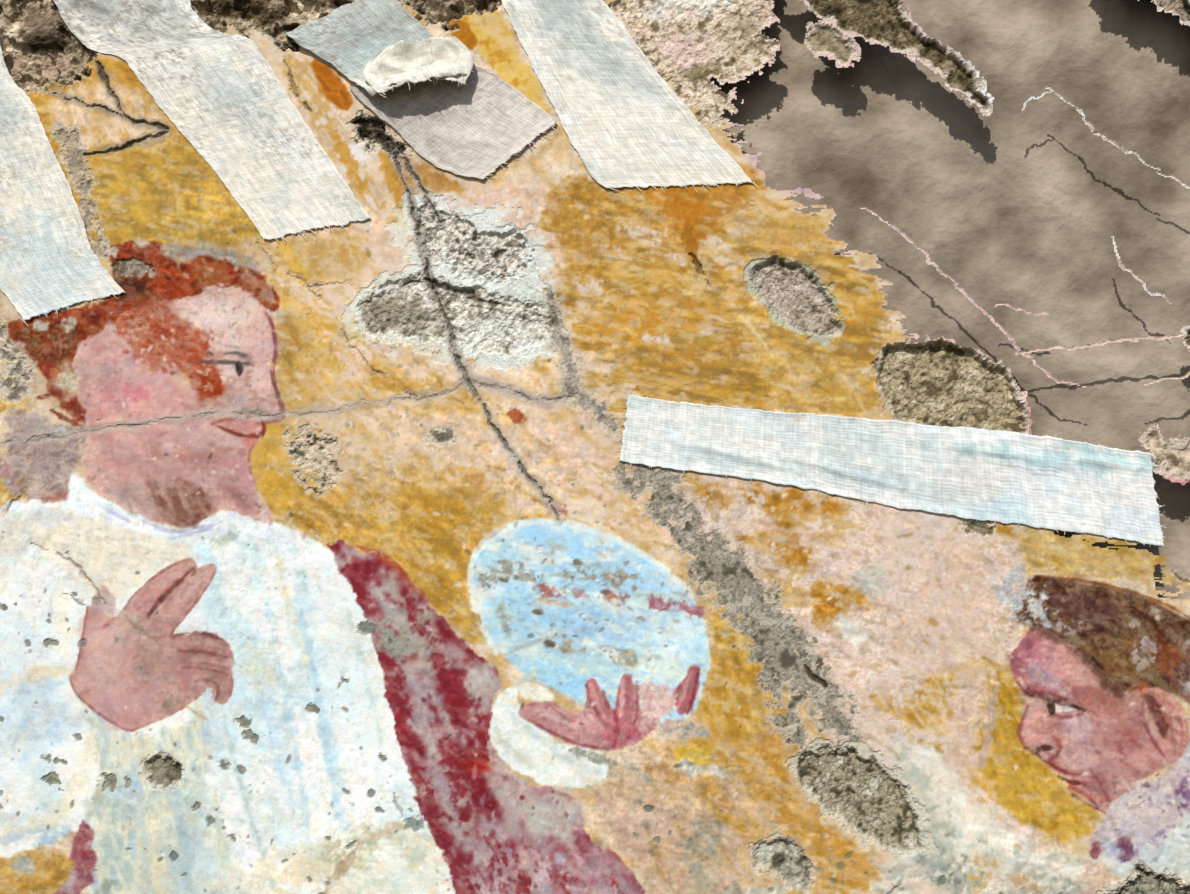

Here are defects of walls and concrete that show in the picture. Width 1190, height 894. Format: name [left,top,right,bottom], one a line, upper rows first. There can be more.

flaking render [0,0,110,98]
crack [52,62,171,157]
flaking render [189,0,355,57]
flaking render [398,0,502,35]
flaking render [603,0,780,135]
flaking render [804,0,994,116]
crack [1022,86,1190,188]
crack [0,148,580,522]
flaking render [350,192,624,440]
flaking render [869,334,1034,438]
crack [861,208,1190,387]
flaking render [604,458,935,864]